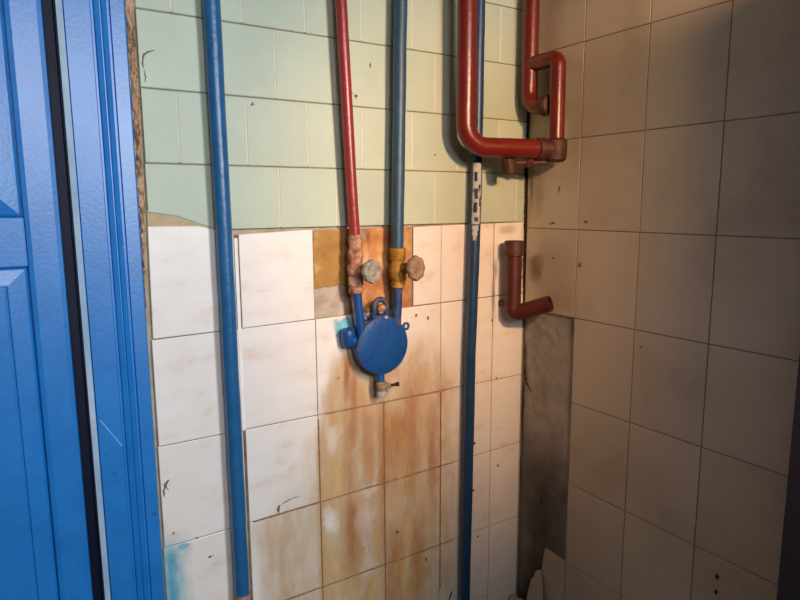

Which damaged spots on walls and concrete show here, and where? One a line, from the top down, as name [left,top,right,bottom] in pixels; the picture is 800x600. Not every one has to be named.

spalling [139,195,215,243]
rust [343,227,412,314]
rust [254,357,453,600]
spalling [518,313,575,600]